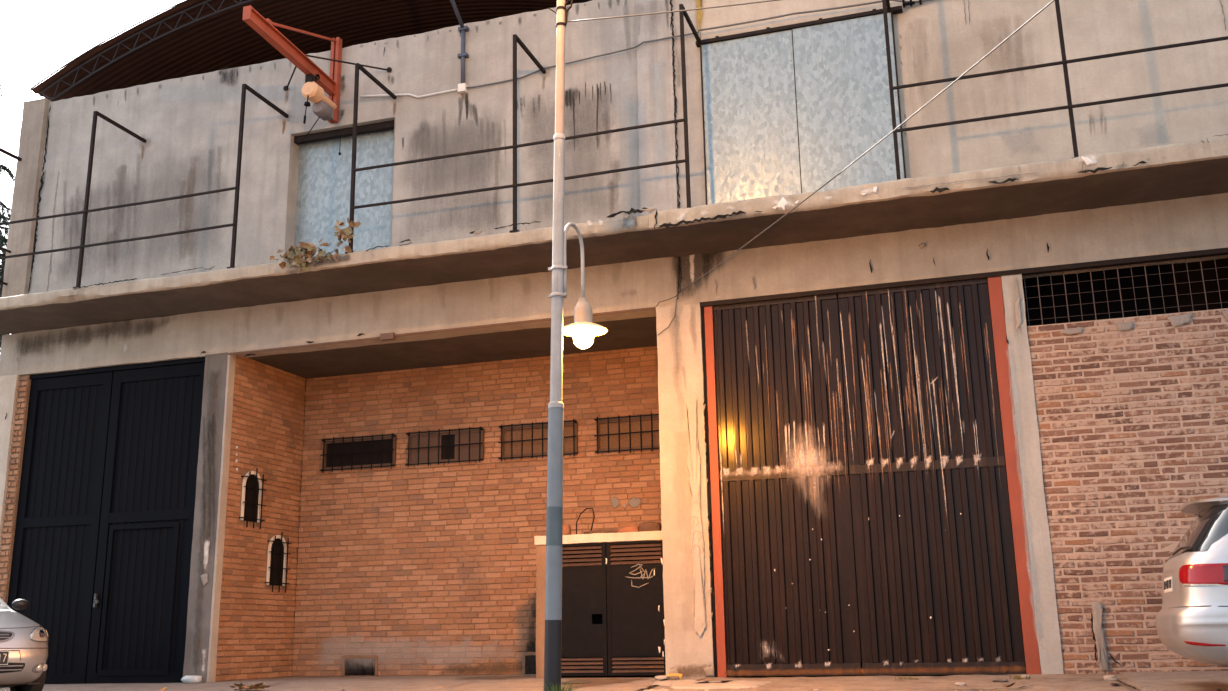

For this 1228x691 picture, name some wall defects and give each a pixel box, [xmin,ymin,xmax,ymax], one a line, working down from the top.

leakage [565,82,611,147]